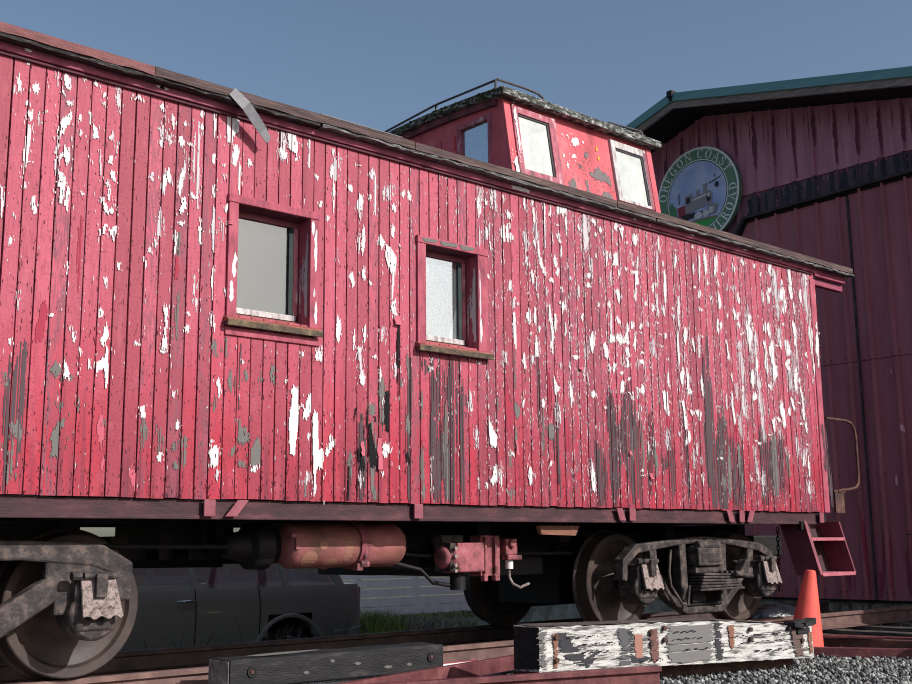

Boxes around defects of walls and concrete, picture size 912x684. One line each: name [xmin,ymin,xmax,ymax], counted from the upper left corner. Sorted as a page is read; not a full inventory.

peeling [45,73,100,212]
damp [748,110,839,177]
damp [848,104,912,156]
peeling [45,308,115,389]
peeling [211,365,334,497]
damp [404,355,471,503]
peeling [511,185,567,389]
damp [553,392,561,497]
damp [594,375,691,507]
peeling [597,223,705,445]
damp [702,328,745,510]
peeling [691,234,820,502]